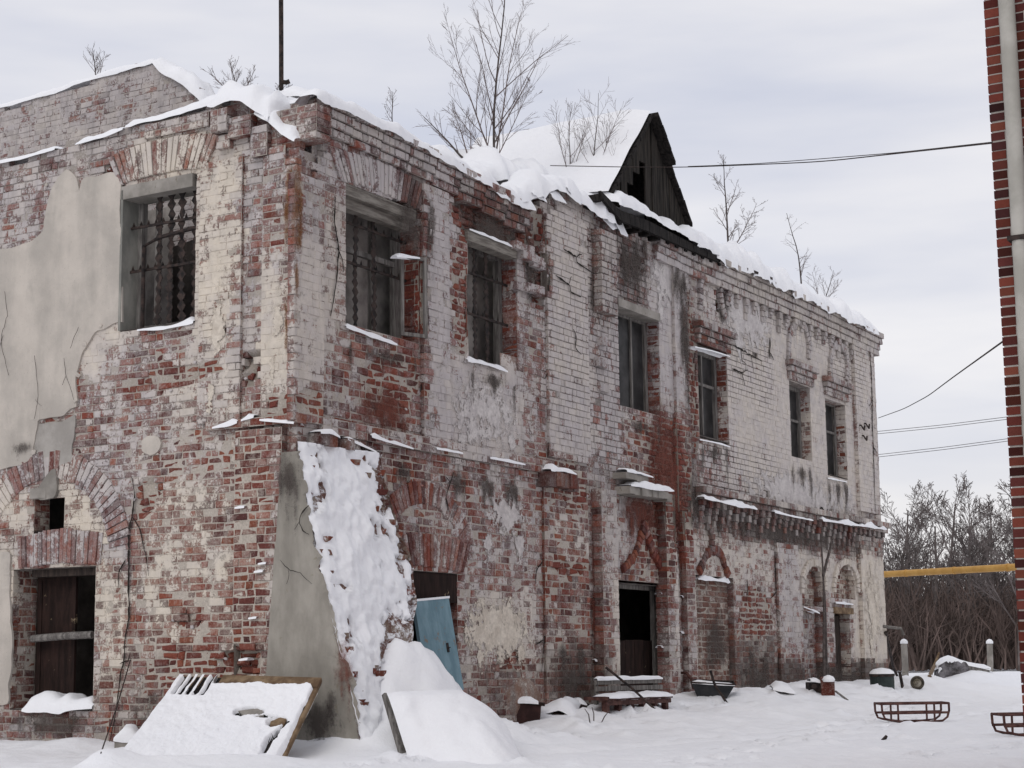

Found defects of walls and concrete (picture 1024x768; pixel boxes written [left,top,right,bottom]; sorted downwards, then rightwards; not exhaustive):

crack [330,197,344,316]
crack [548,249,591,297]
crack [34,327,79,419]
peeling [0,167,124,470]
spalling [138,260,228,414]
peeling [141,436,162,456]
spalling [648,292,699,552]
spalling [133,481,162,519]
peeling [474,487,532,571]
spalling [555,563,587,577]
spalling [132,645,261,696]
peeling [463,589,537,674]